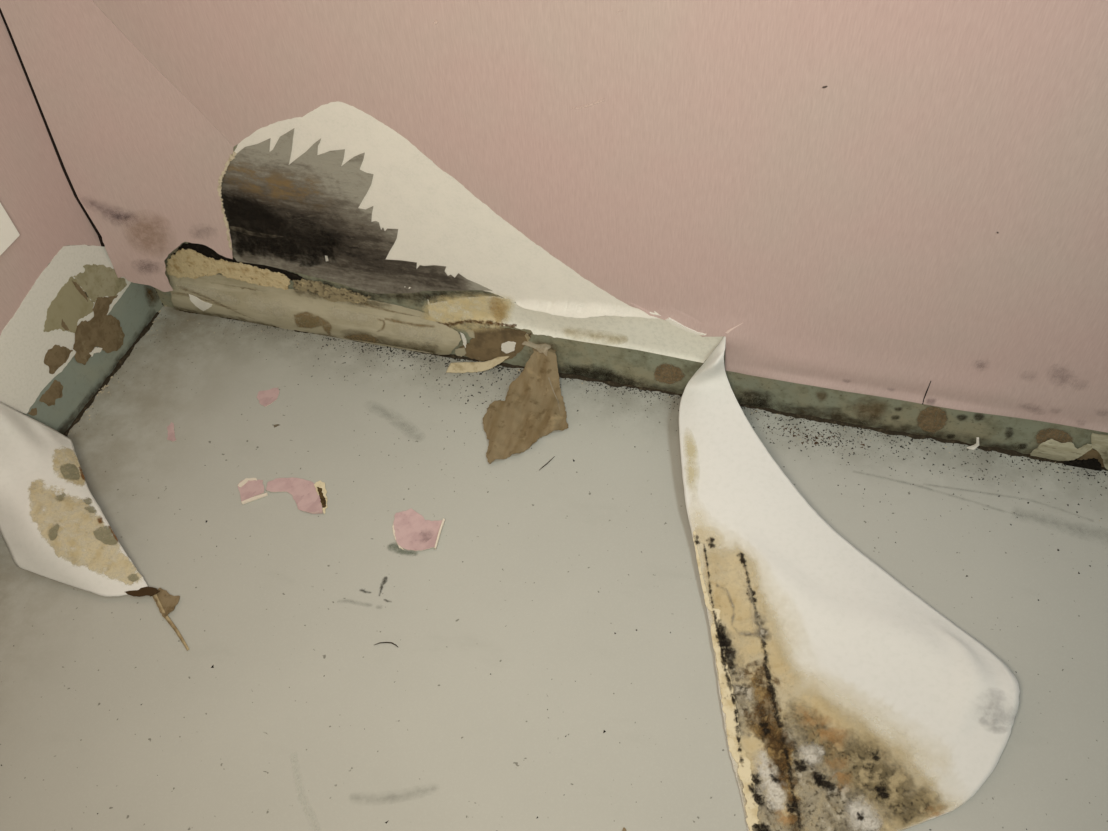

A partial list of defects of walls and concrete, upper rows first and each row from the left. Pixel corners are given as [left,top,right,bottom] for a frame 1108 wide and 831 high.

peeling [74,347,102,365]
damp [147,129,492,355]
peeling [455,328,475,357]
peeling [501,341,516,353]
peeling [0,402,190,651]
peeling [679,336,1020,831]